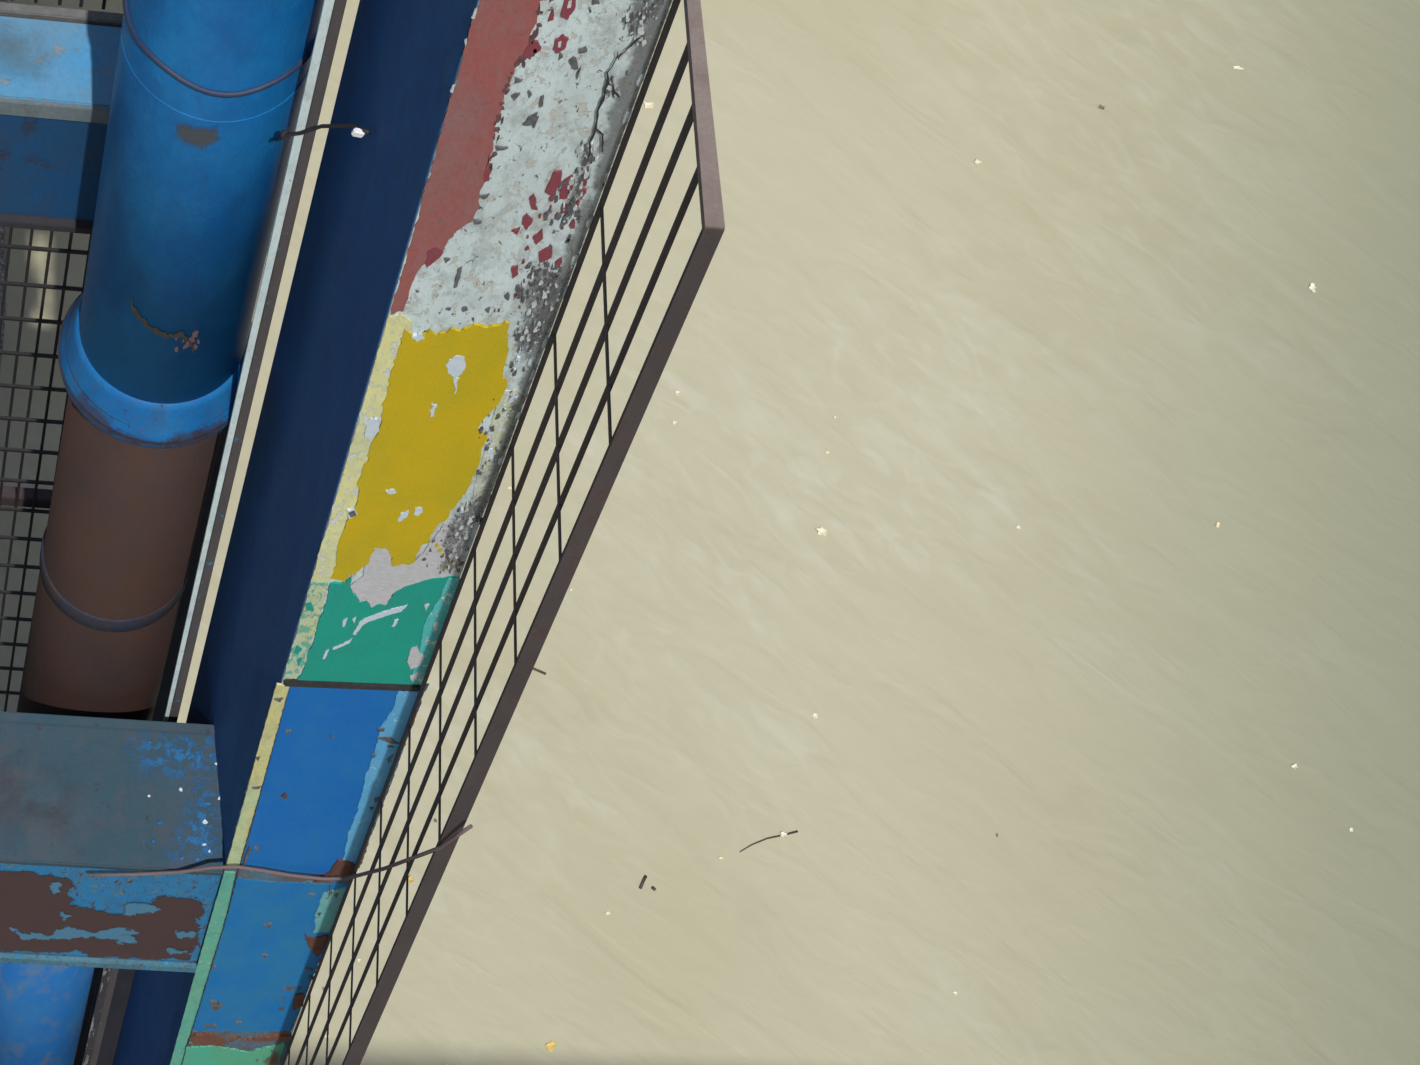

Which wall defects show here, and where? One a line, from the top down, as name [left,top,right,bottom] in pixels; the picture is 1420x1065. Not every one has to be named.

corrosion [179,126,217,146]
peeling [480,0,600,199]
crack [588,35,644,158]
peeling [425,247,462,288]
peeling [446,151,608,476]
peeling [364,416,380,439]
peeling [322,506,471,659]
peeling [407,645,425,680]
corrosion [0,870,204,961]